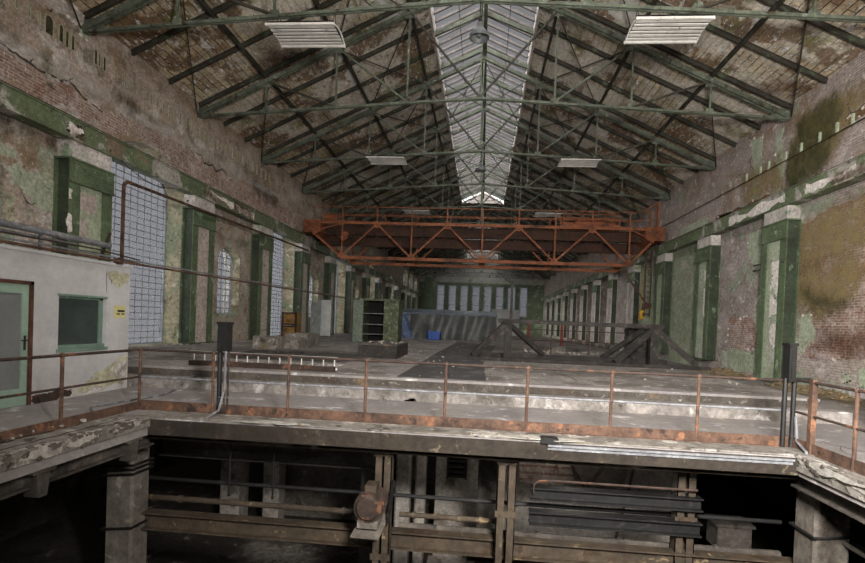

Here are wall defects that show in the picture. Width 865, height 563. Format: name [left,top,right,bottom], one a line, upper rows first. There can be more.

crack [0,43,103,112]
flaking render [0,44,306,238]
water stain [796,91,864,168]
water stain [742,156,781,203]
peeling [804,163,856,194]
spalling [0,418,150,466]
spalling [800,458,865,495]